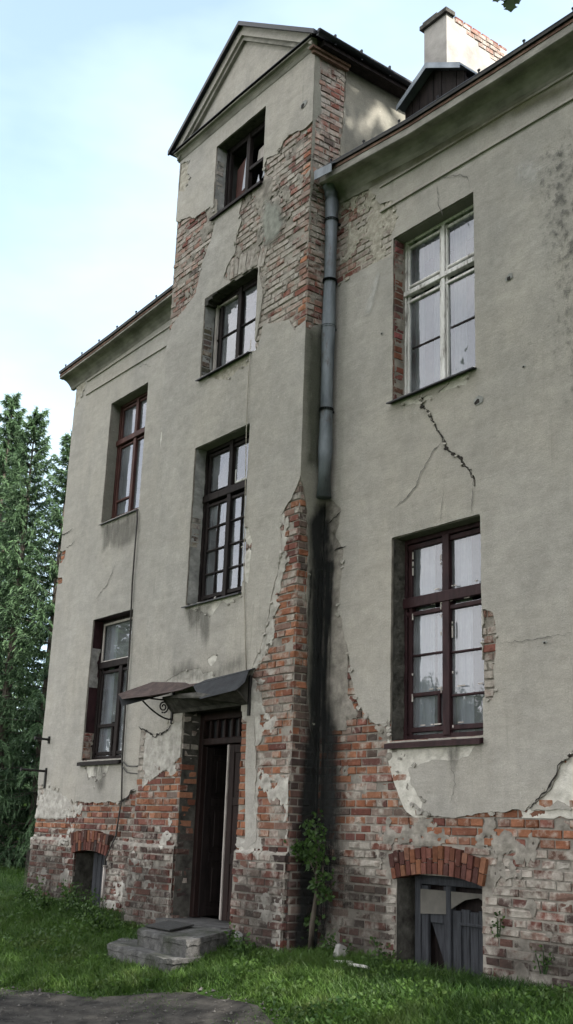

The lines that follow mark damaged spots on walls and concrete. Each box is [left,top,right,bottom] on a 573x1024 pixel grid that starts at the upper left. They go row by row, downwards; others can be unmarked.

flaking render [170,160,224,330]
flaking render [201,58,471,409]
crack [396,396,474,510]
flaking render [26,713,199,925]
flaking render [229,481,315,953]
leakage [294,504,341,953]
flaking render [317,499,573,989]
crack [525,753,570,811]